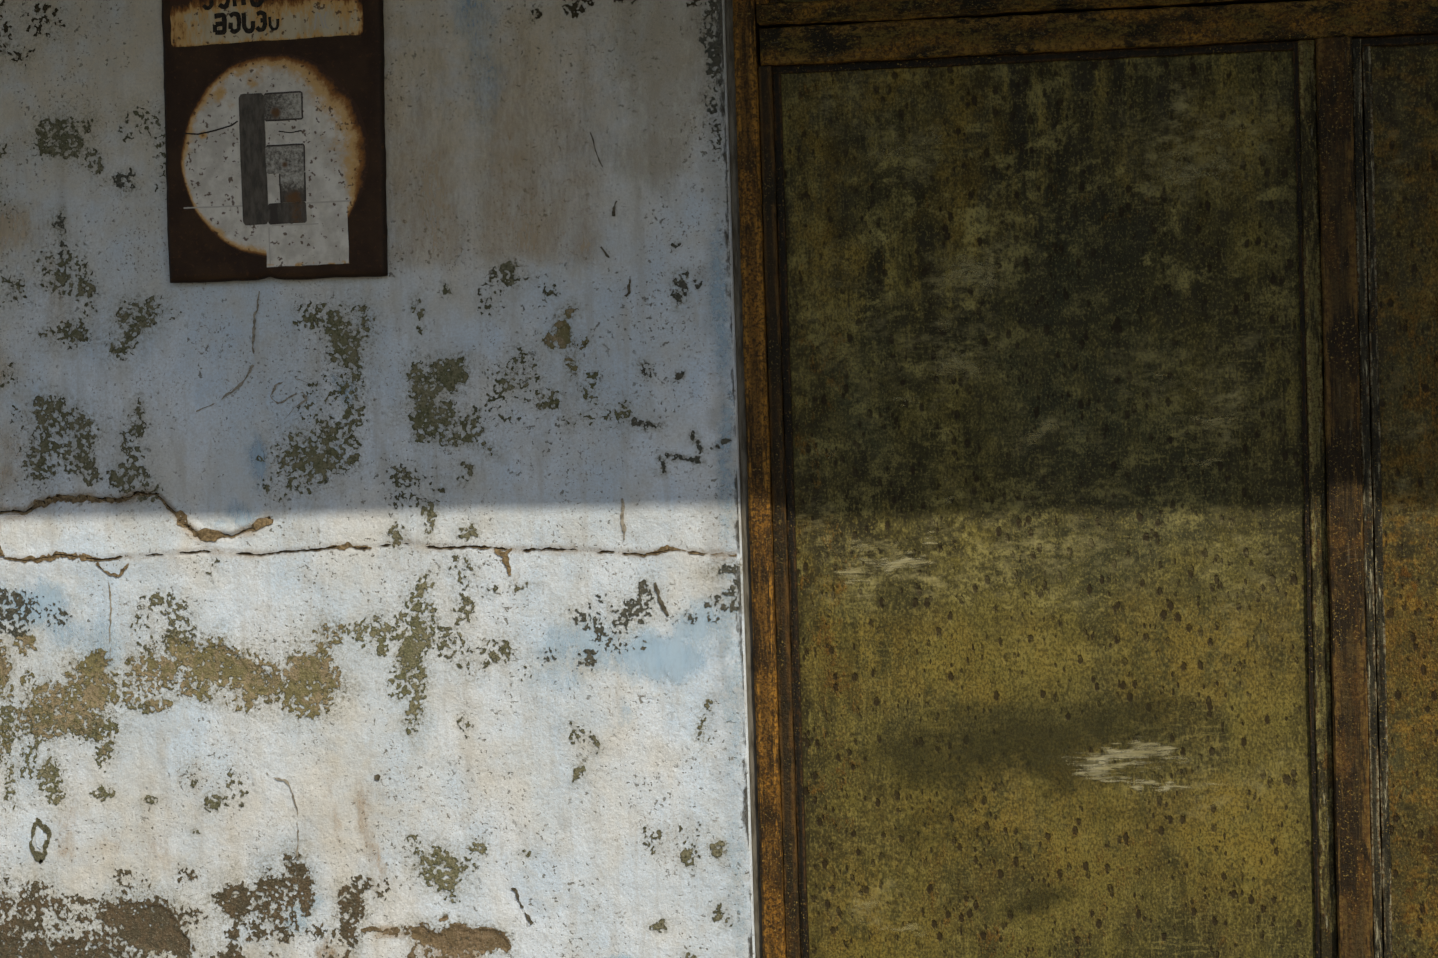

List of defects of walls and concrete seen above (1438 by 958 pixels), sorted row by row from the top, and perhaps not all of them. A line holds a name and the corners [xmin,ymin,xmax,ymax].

spalling [542,306,589,376]
crack [0,491,737,659]
peeling [0,623,346,762]
spalling [29,818,52,863]
peeling [0,869,208,958]
spalling [361,915,511,958]